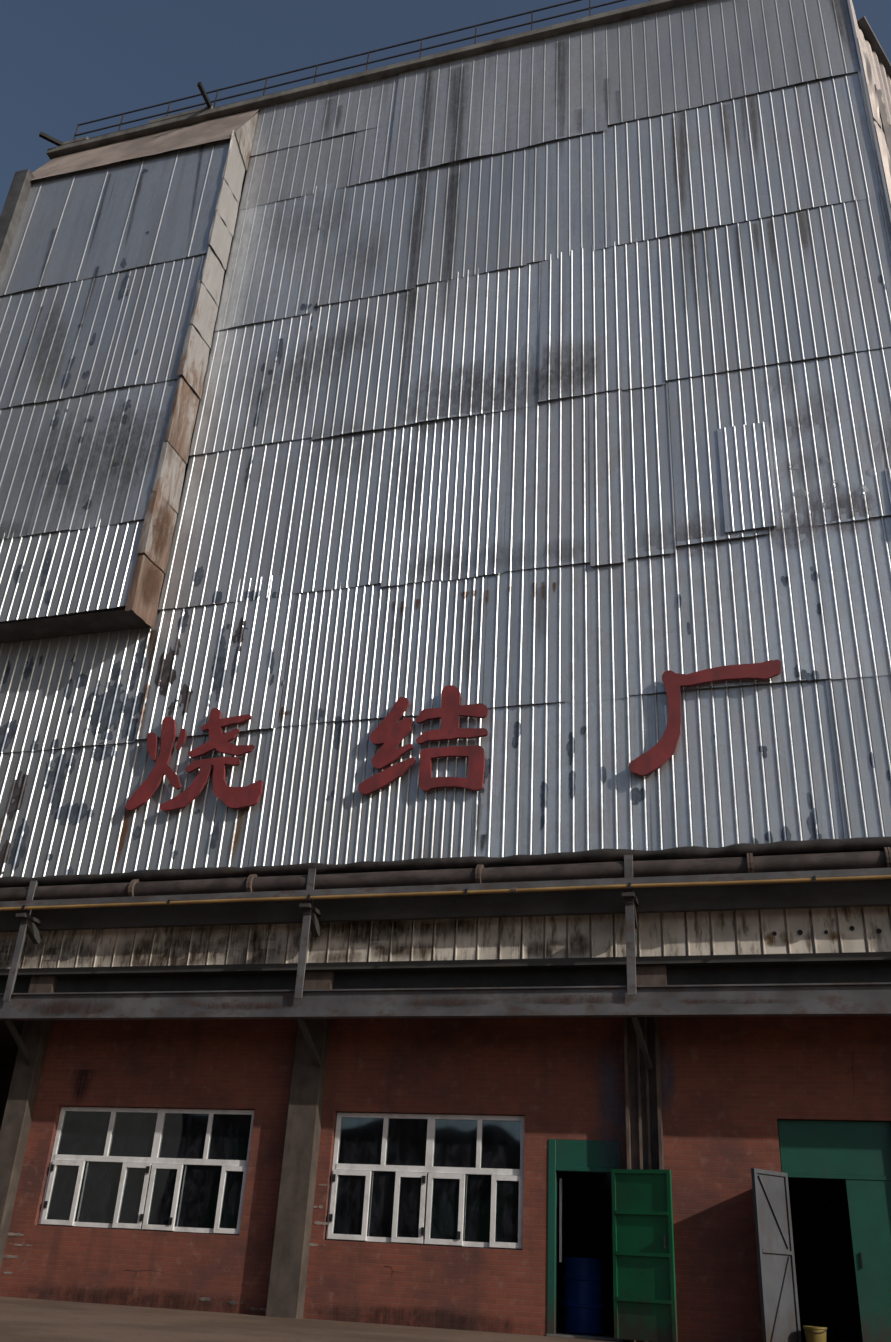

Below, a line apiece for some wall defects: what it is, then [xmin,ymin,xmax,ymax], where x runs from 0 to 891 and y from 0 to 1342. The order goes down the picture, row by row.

damp [410,72,431,302]
damp [445,67,464,287]
corrosion [144,506,169,599]
peeling [244,590,278,601]
peeling [3,653,43,684]
peeling [207,617,248,707]
peeling [0,719,17,752]
peeling [30,606,193,825]
peeling [0,771,29,876]
peeling [207,822,219,854]